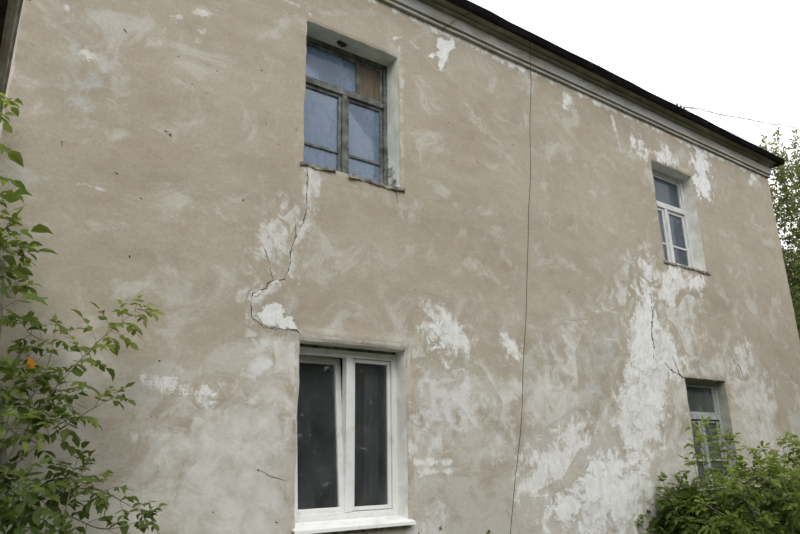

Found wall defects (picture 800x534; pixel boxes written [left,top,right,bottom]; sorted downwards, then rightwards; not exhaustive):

peeling [362,0,762,205]
crack [244,159,321,334]
peeling [238,302,303,385]
crack [651,300,684,378]
peeling [505,405,661,534]